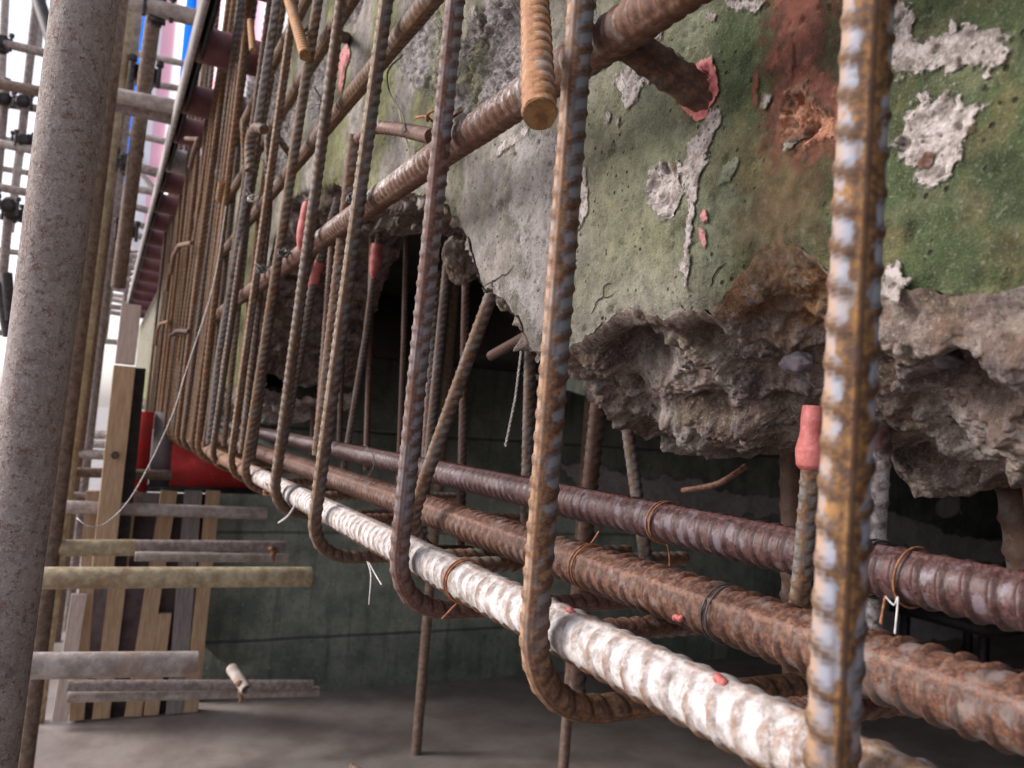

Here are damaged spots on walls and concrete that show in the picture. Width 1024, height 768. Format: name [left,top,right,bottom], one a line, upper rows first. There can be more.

corrosion [751,0,842,168]
water stain [734,125,836,270]
spalling [287,433,315,457]
spalling [457,379,469,465]
peeling [598,464,631,496]
peeling [641,473,781,520]
spalling [650,503,796,576]
spalling [895,549,1024,632]